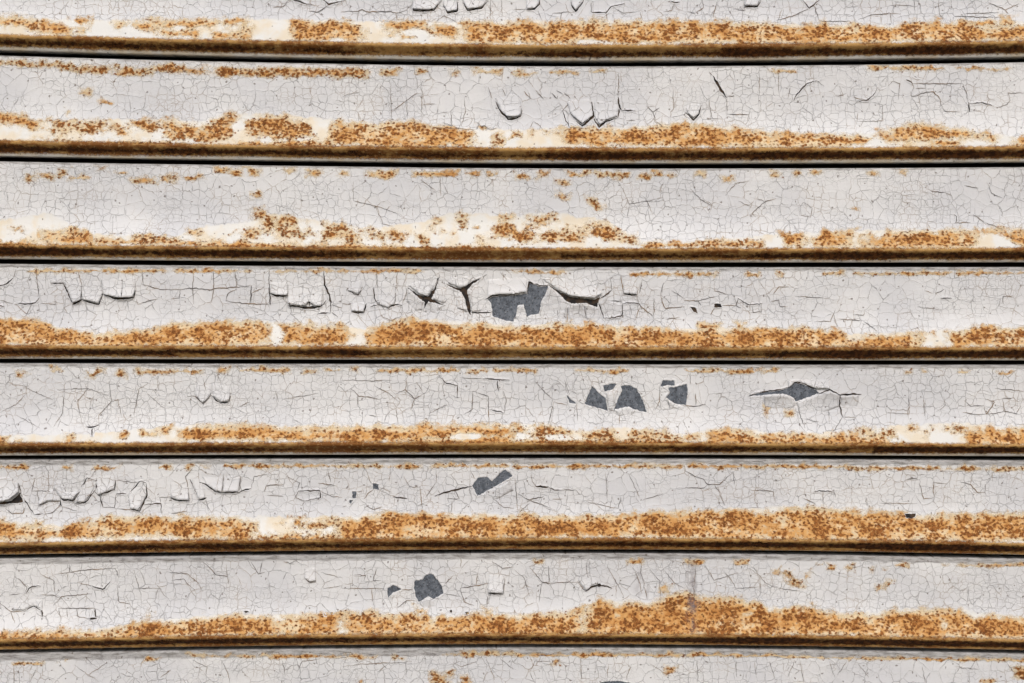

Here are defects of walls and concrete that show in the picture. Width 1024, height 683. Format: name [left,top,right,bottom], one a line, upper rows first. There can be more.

crack [273,0,410,18]
rust [0,15,1024,80]
crack [710,73,1021,122]
rust [0,111,1024,200]
peeling [342,273,637,324]
peeling [540,376,706,424]
peeling [747,379,861,429]
crack [515,471,775,512]
rust [0,506,1024,570]
crack [12,562,229,622]
peeling [304,562,511,616]
rust [0,583,1024,680]